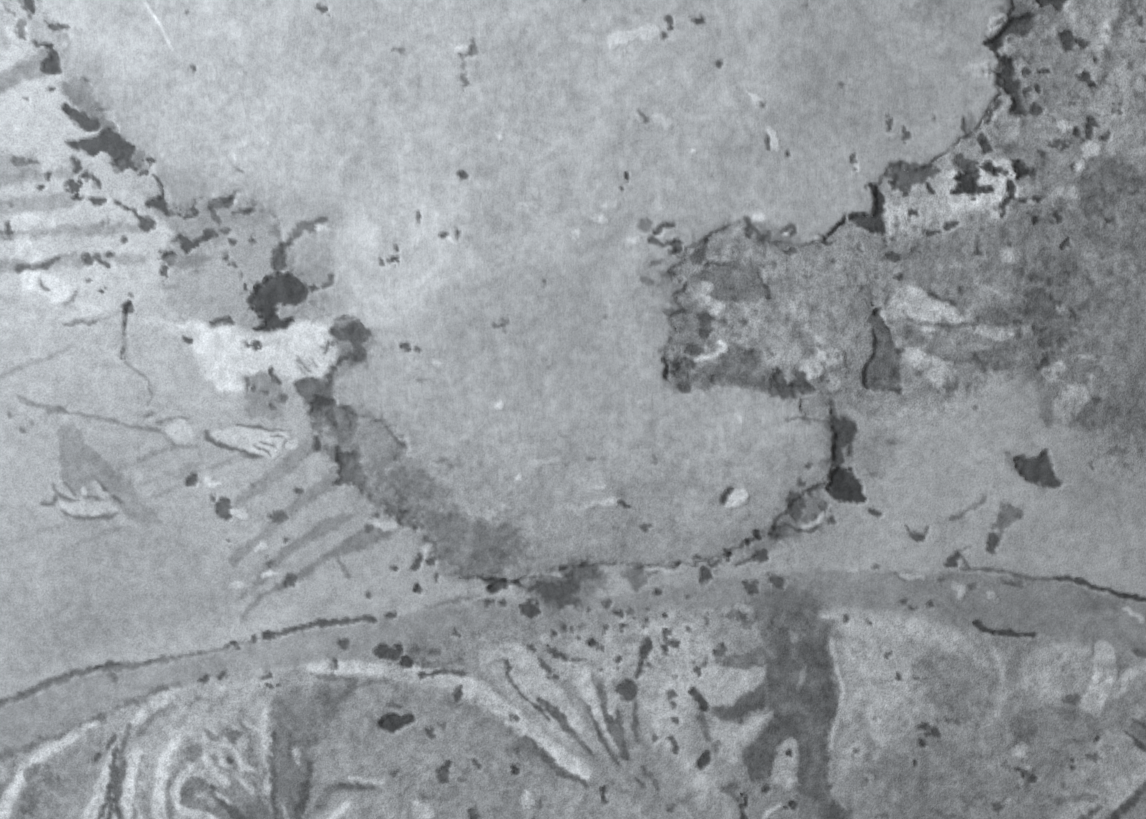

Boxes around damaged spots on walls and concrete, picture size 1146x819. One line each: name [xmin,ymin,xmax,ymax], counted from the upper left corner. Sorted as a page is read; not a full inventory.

spalling [456,168,471,182]
flaking render [0,0,378,483]
hole [377,243,402,272]
hole [438,226,463,247]
hole [490,310,514,337]
hole [399,341,445,387]
flaking render [527,0,1146,759]
flaking render [183,471,251,544]
flaking render [254,509,299,591]
flaking render [389,549,442,595]
crack [959,557,1146,660]
hole [913,716,972,770]